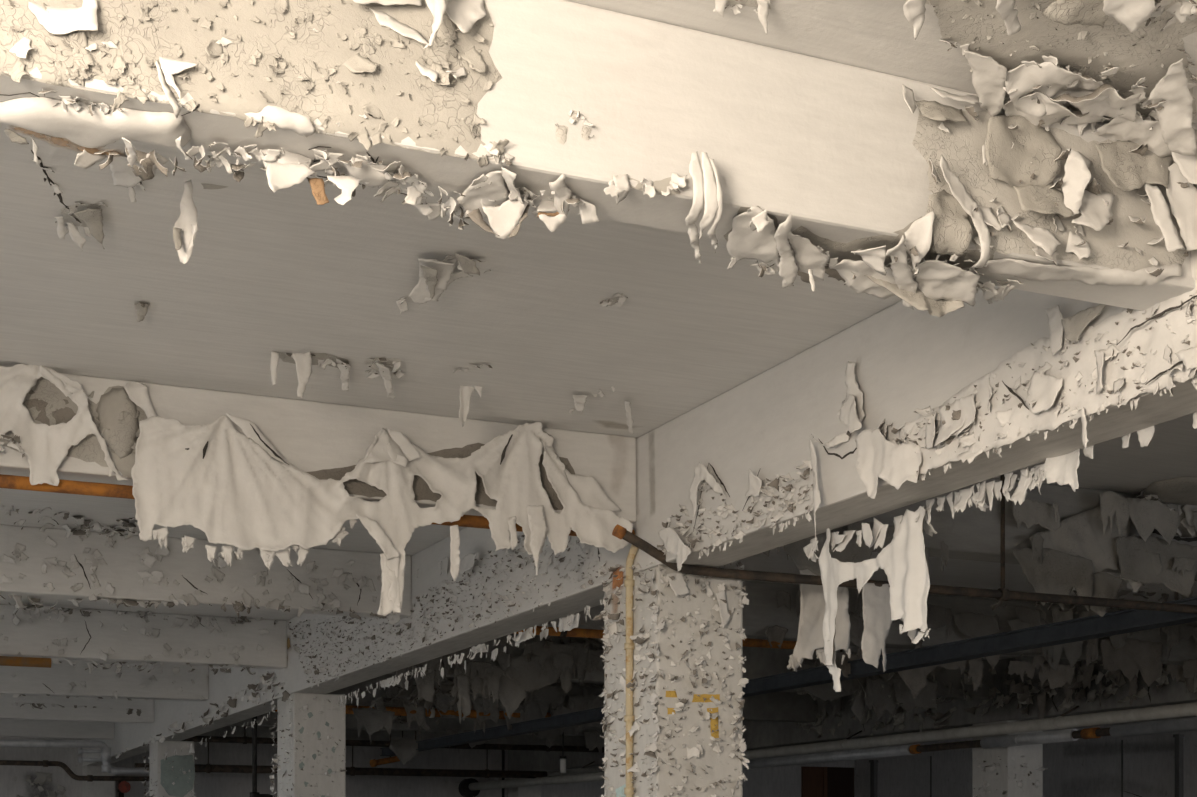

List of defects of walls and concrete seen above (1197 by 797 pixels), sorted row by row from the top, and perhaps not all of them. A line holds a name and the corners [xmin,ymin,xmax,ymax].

peeling [0,0,600,264]
peeling [396,253,491,315]
peeling [604,0,1197,317]
peeling [0,280,1197,797]